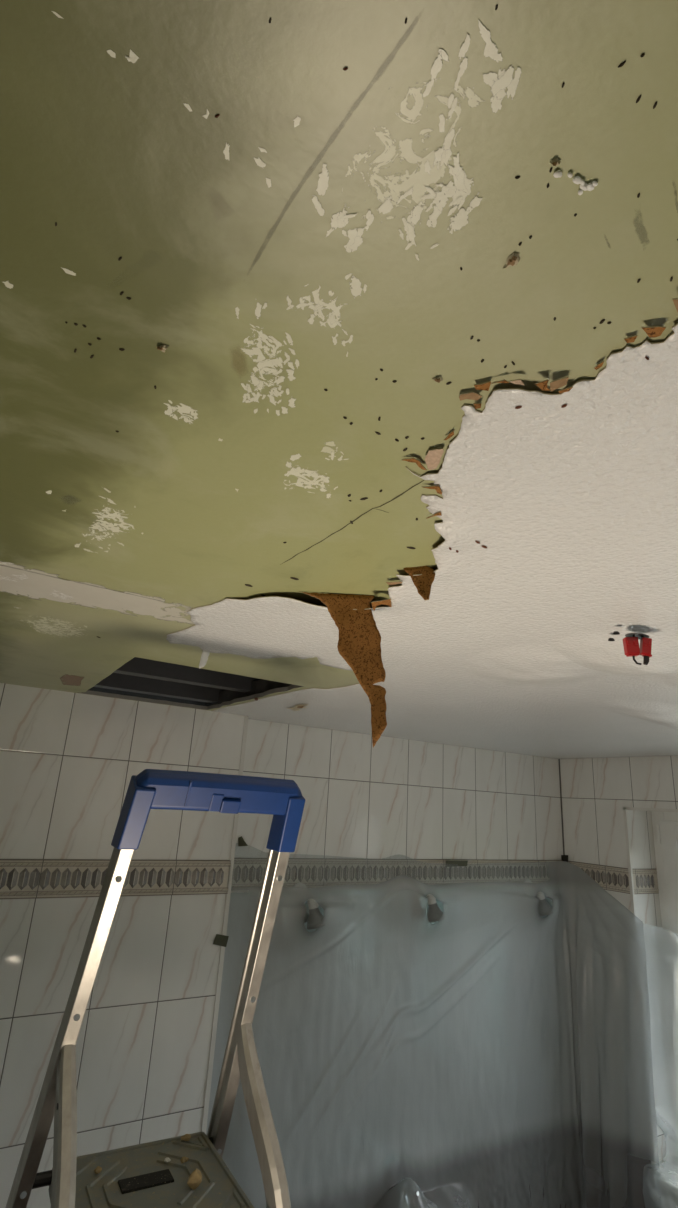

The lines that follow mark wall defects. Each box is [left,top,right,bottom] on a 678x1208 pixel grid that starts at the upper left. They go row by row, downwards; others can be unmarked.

peeling [312,20,522,261]
peeling [286,295,353,357]
peeling [241,332,299,416]
peeling [432,361,573,409]
peeling [164,400,183,420]
peeling [284,454,382,502]
peeling [371,581,403,611]